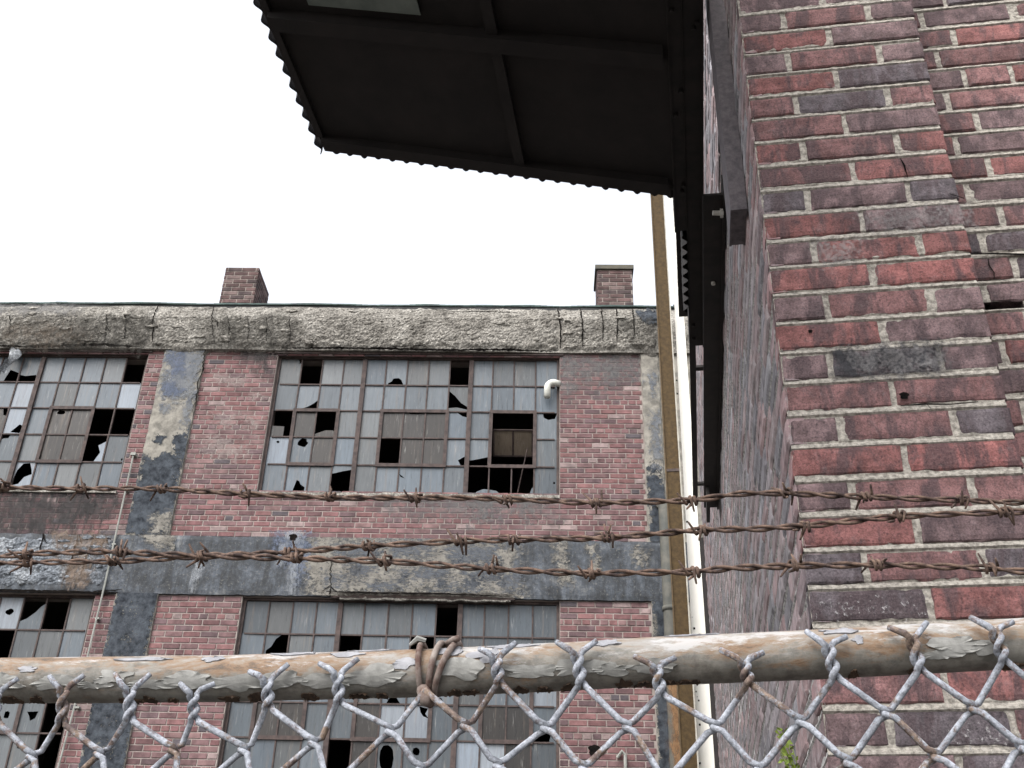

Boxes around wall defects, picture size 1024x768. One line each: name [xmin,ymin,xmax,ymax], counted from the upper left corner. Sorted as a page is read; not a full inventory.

crack [192,305,635,411]
damp [268,530,317,588]